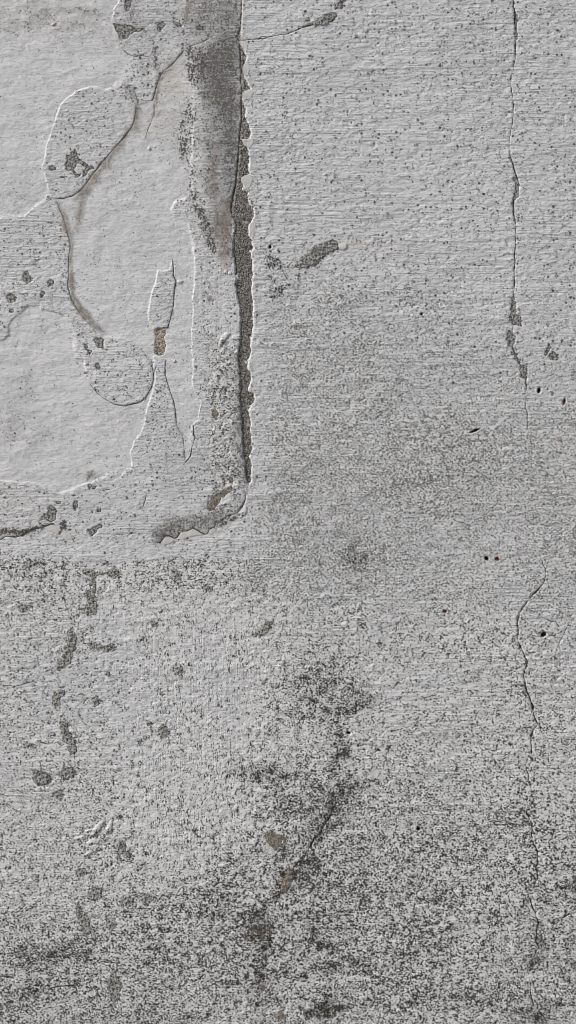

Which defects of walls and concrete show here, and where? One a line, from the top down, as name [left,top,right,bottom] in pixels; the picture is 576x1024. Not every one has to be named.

spalling [113,0,144,40]
damp [173,0,246,260]
spalling [49,151,95,178]
crack [56,2,312,326]
crack [506,0,532,444]
spalling [231,41,256,483]
spalling [83,337,104,374]
spalling [154,328,166,356]
spalling [207,477,234,511]
spalling [39,495,78,540]
peeling [156,528,216,545]
crack [517,562,573,1006]